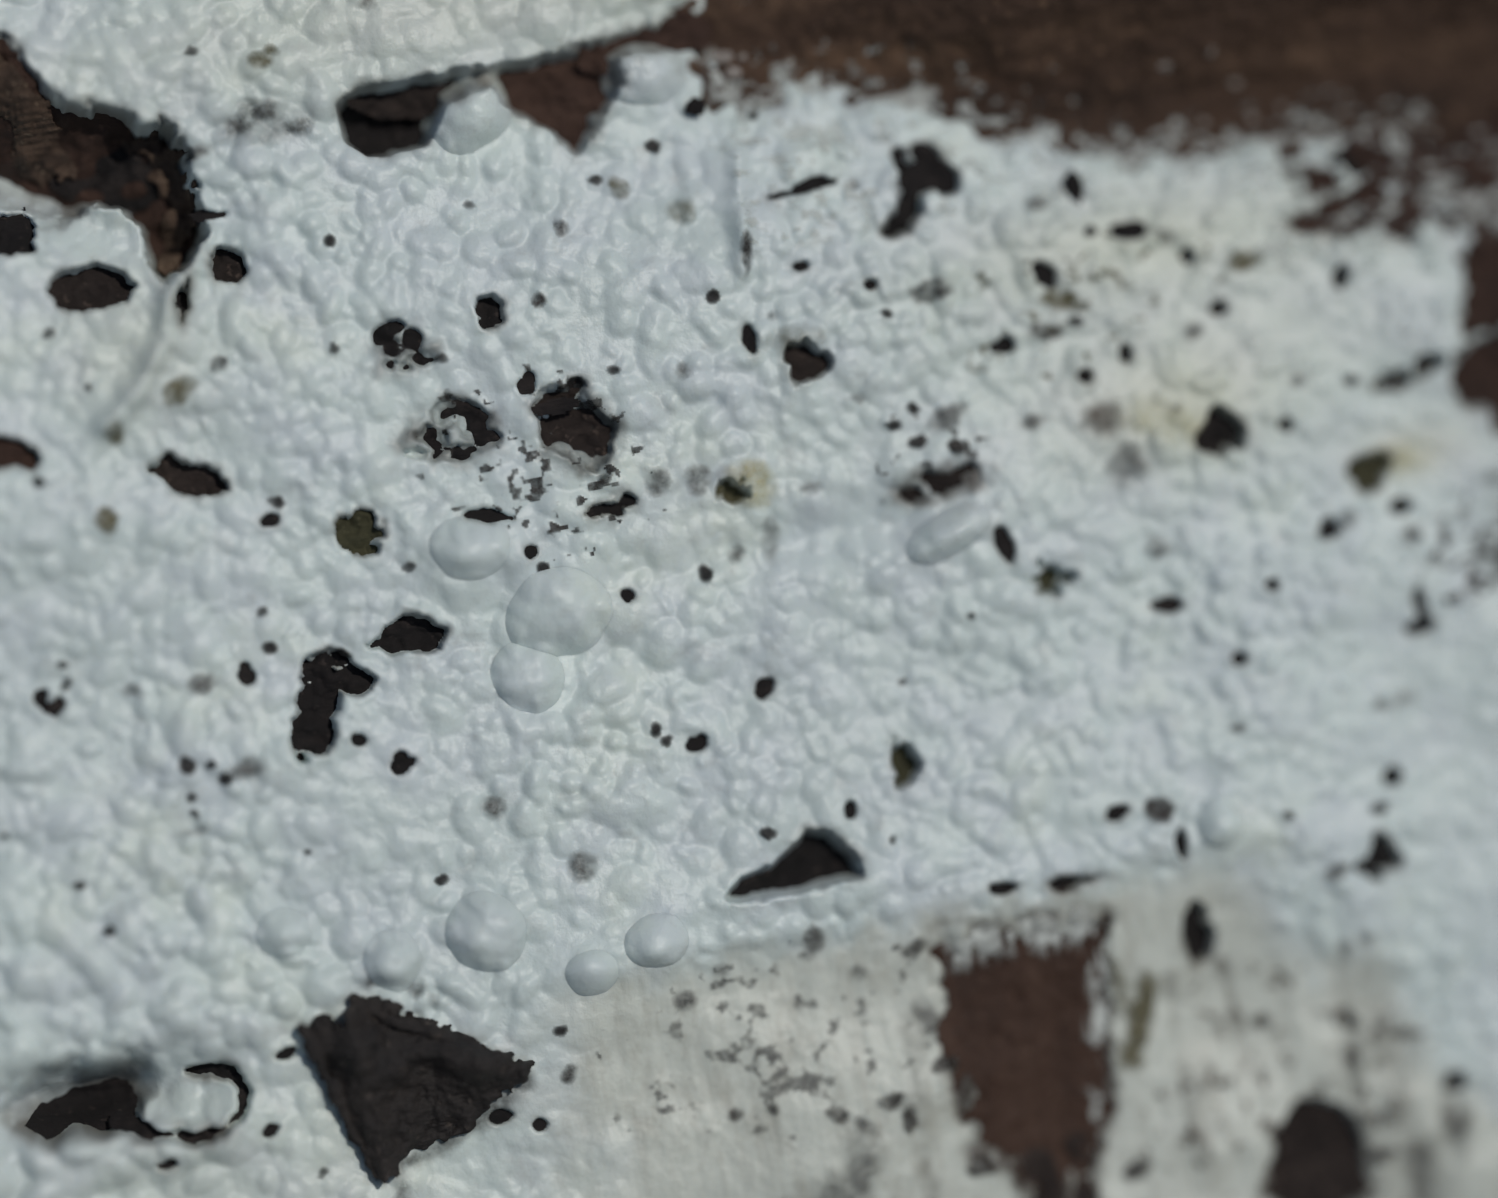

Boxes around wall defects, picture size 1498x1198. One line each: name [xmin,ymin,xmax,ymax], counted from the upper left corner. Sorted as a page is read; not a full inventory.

peeling [1290,114,1498,432]
peeling [537,381,612,458]
peeling [900,463,975,503]
damp [712,969,767,1021]
damp [717,1045,868,1128]
damp [886,1093,917,1132]
damp [892,940,923,980]
damp [968,1145,1036,1196]
peeling [930,907,1116,1198]
damp [1107,964,1156,1066]
damp [1124,1150,1150,1179]
peeling [1266,1097,1386,1198]